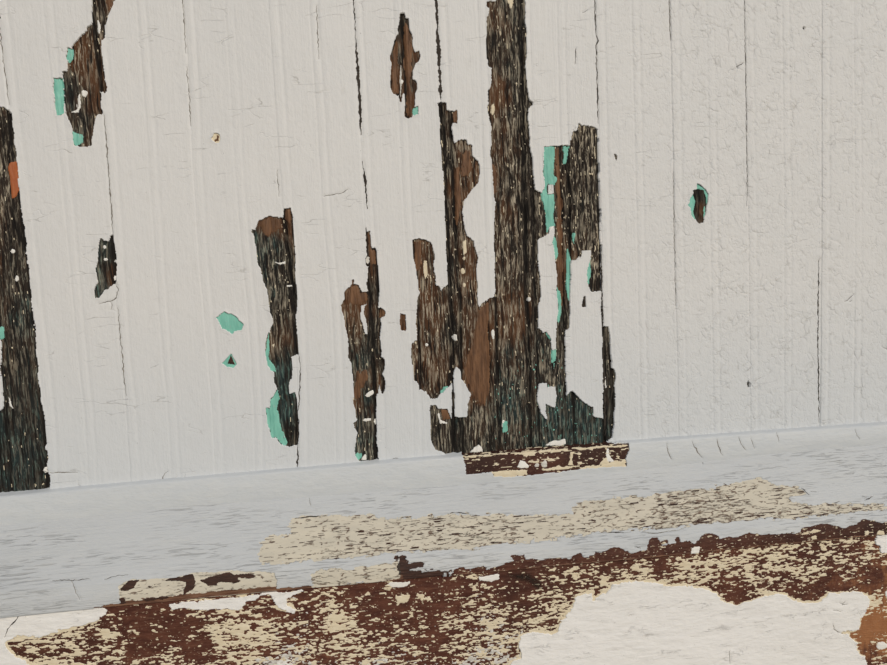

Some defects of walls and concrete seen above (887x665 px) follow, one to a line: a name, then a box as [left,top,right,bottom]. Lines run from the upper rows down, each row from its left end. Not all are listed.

peeling [54,0,115,147]
peeling [390,13,420,119]
peeling [0,107,50,493]
peeling [94,235,117,298]
peeling [222,354,237,368]
peeling [216,311,244,334]
peeling [251,208,299,447]
peeling [341,231,386,461]
peeling [400,0,629,477]
peeling [688,184,708,223]
peeling [5,477,887,665]